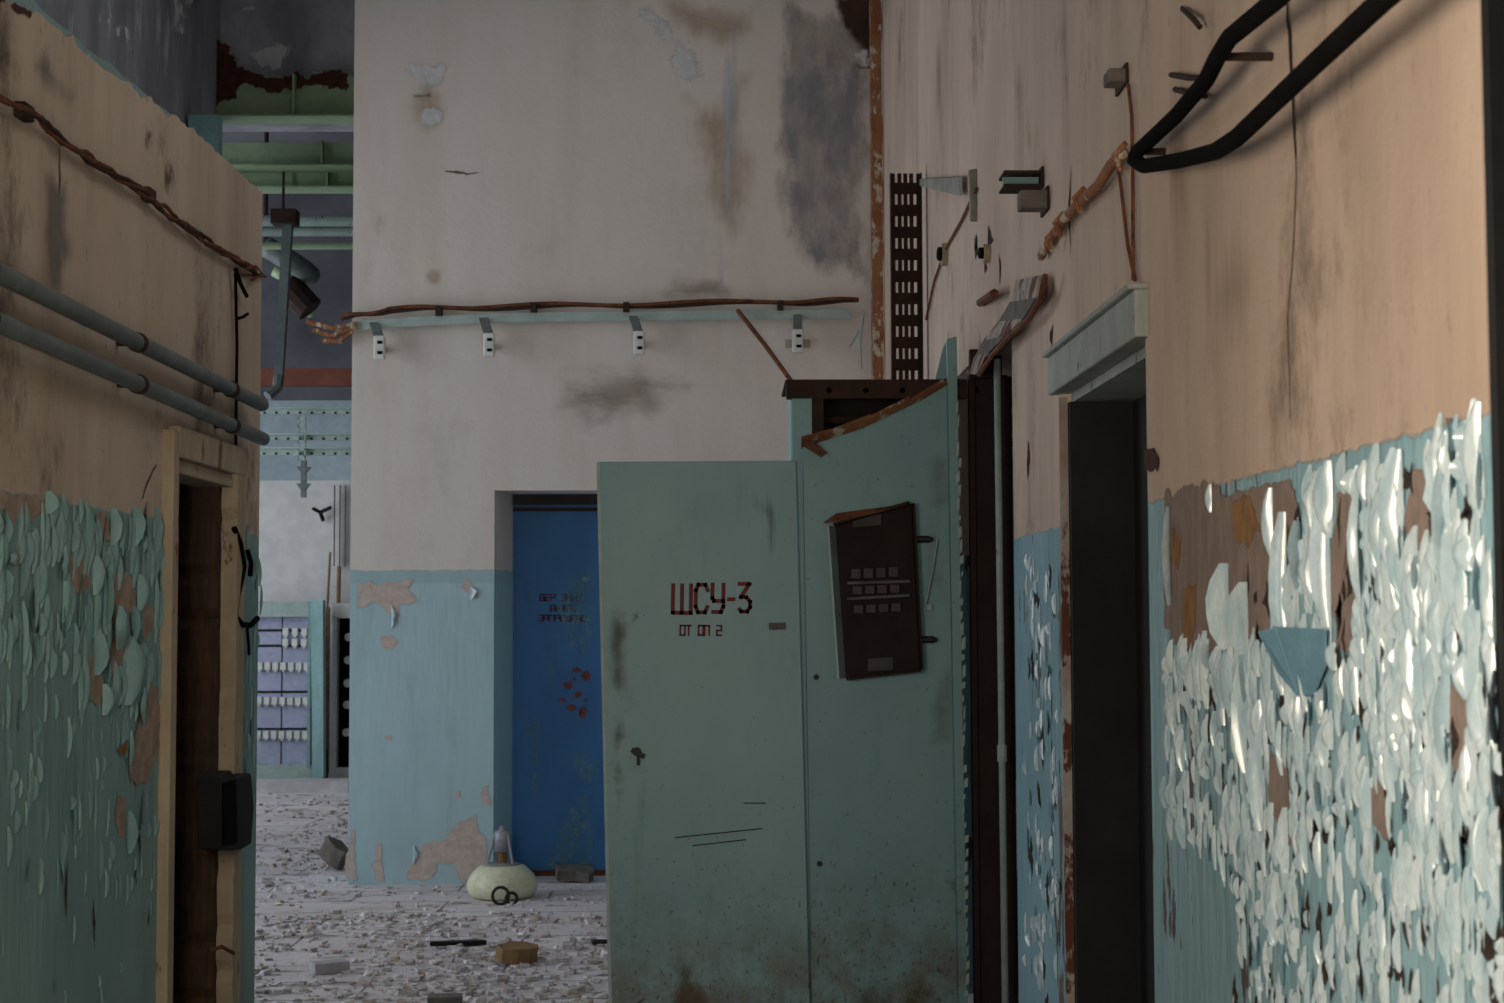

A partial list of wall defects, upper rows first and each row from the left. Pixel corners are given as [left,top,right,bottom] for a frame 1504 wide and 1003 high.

damp [781,11,867,271]
peeling [243,525,263,794]
peeling [345,829,385,881]
peeling [356,579,418,650]
peeling [407,785,491,883]
peeling [1022,554,1060,1003]
peeling [1159,398,1504,1003]